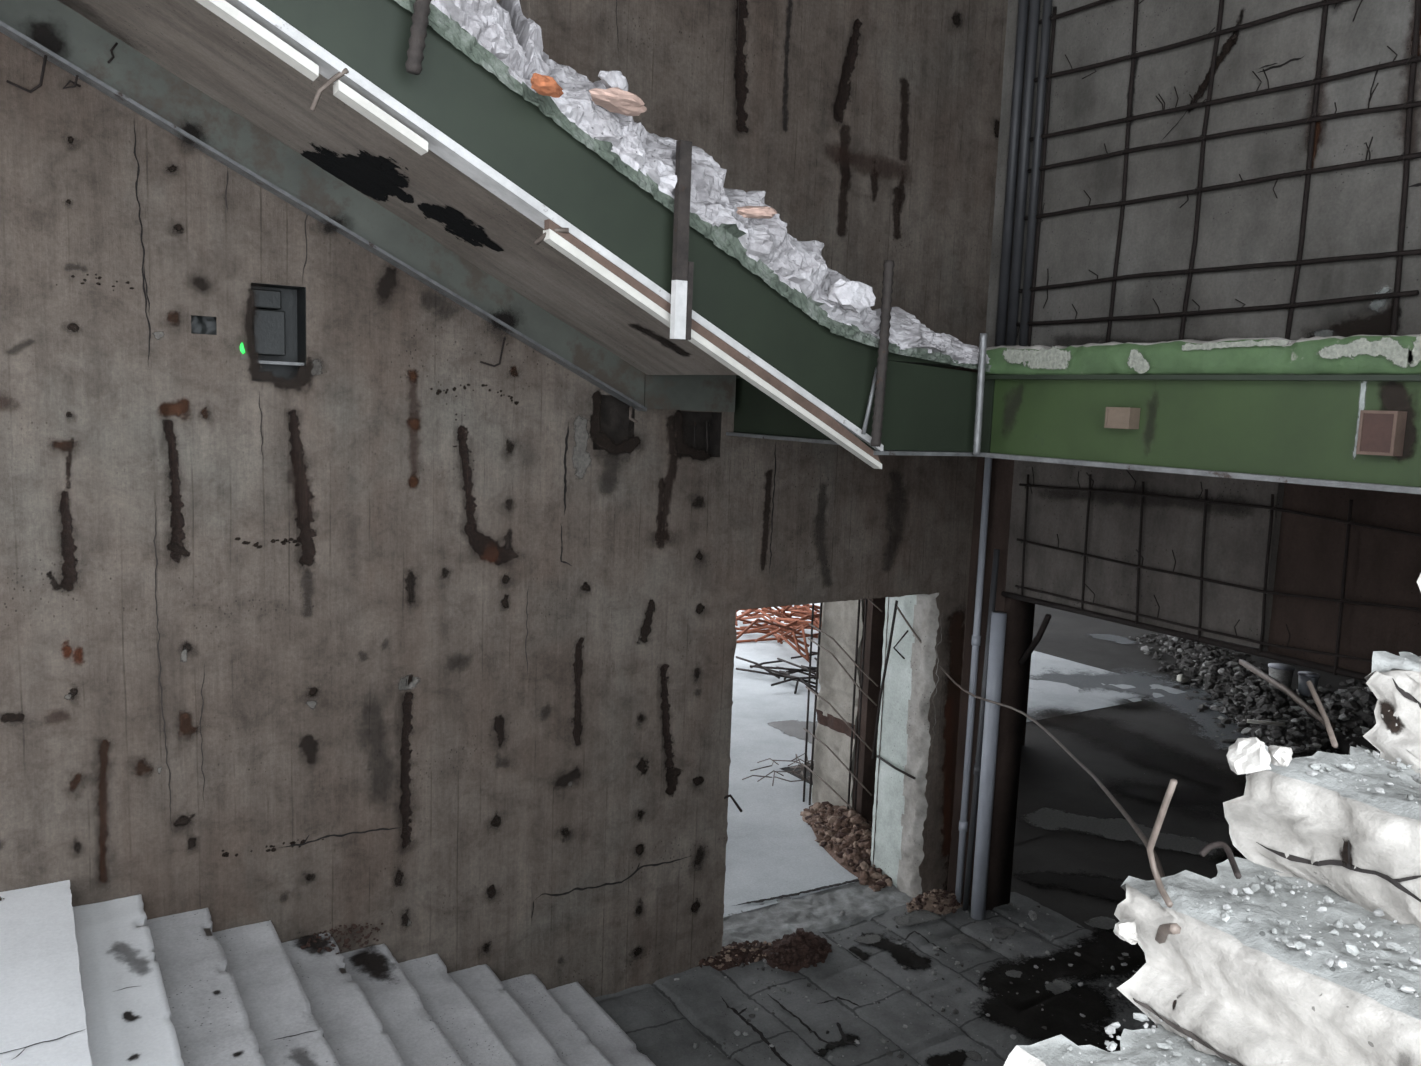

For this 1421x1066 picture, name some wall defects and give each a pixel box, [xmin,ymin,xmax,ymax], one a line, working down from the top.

flaking render [300,143,504,252]
peeling [1309,288,1421,368]
spalling [861,260,895,447]
peeling [1003,346,1072,370]
rust [52,441,74,489]
crack [1392,678,1421,708]
spalling [1379,701,1404,734]
leakage [1014,871,1126,903]
crack [1256,840,1421,902]
leakage [847,933,931,970]
leakage [974,922,1146,1052]
leakage [925,1049,968,1066]